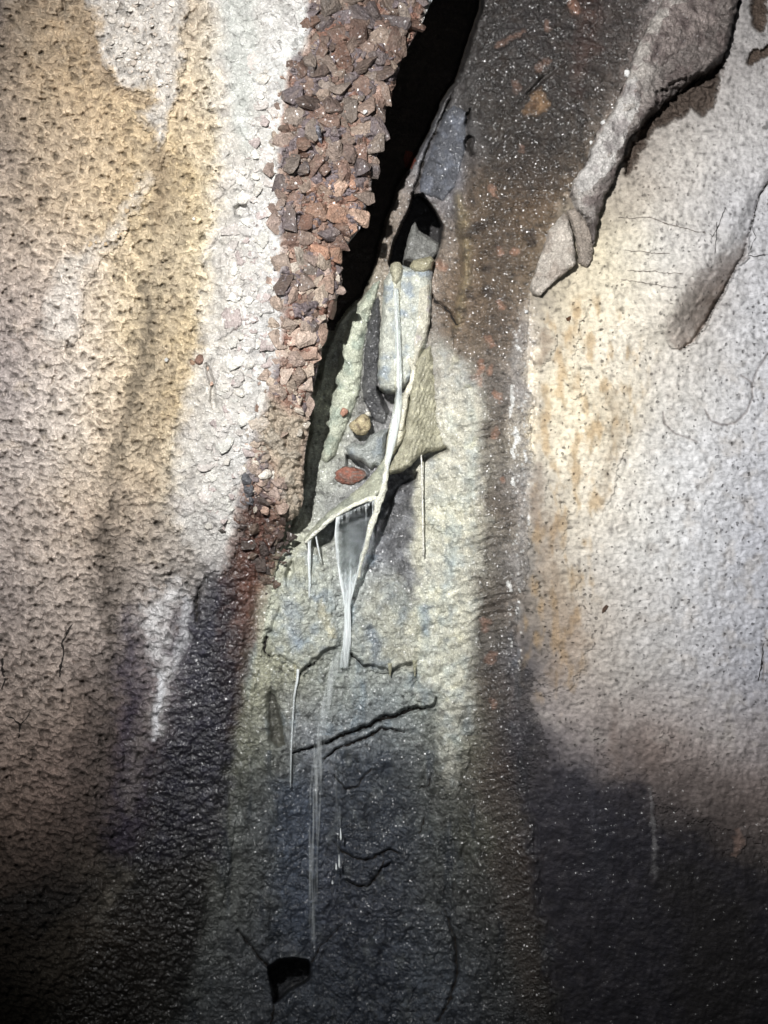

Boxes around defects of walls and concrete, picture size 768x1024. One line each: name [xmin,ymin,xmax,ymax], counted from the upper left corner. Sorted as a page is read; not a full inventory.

flaking render [162,0,429,595]
crack [327,0,509,331]
corrosion [221,478,286,734]
crack [292,707,426,790]
crack [334,842,399,887]
damp [263,0,768,1024]